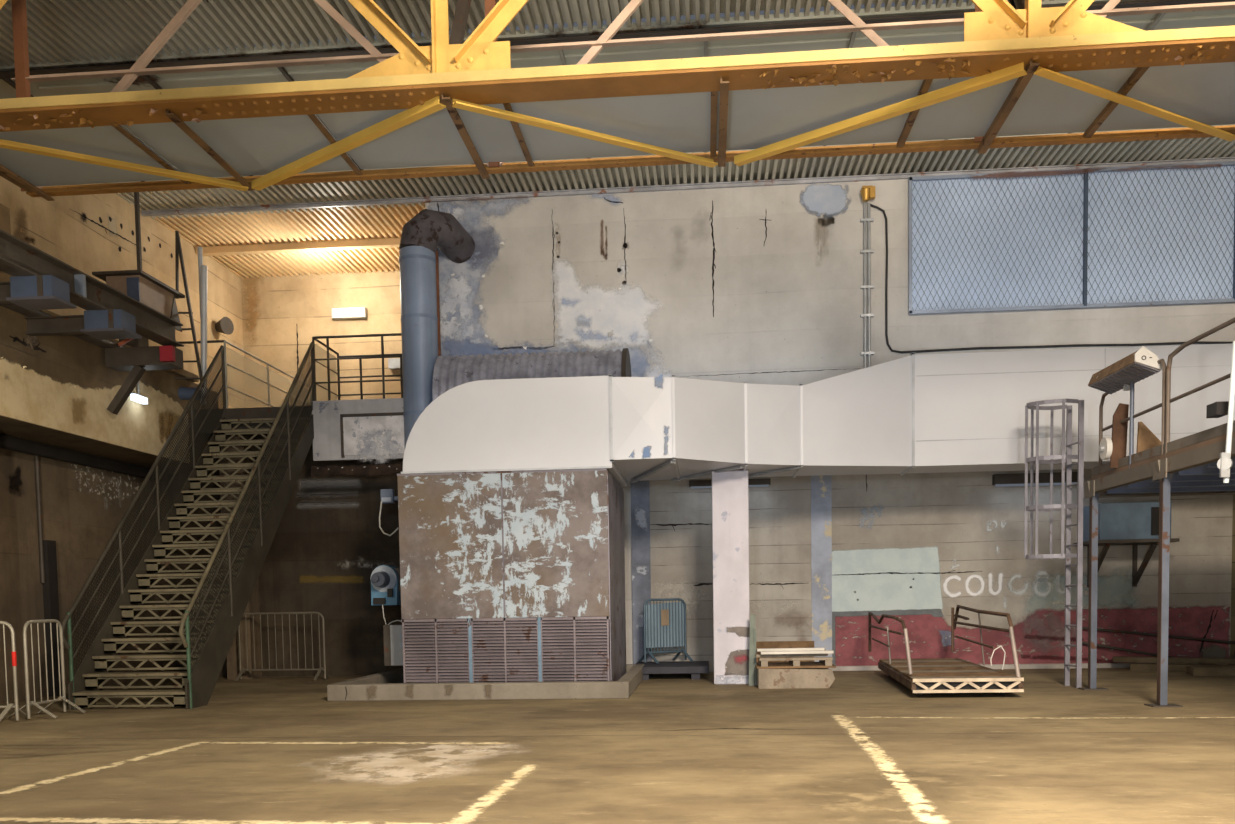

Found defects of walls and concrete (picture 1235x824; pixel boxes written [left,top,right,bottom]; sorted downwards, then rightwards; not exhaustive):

flaking render [429,198,672,388]
crack [709,200,717,317]